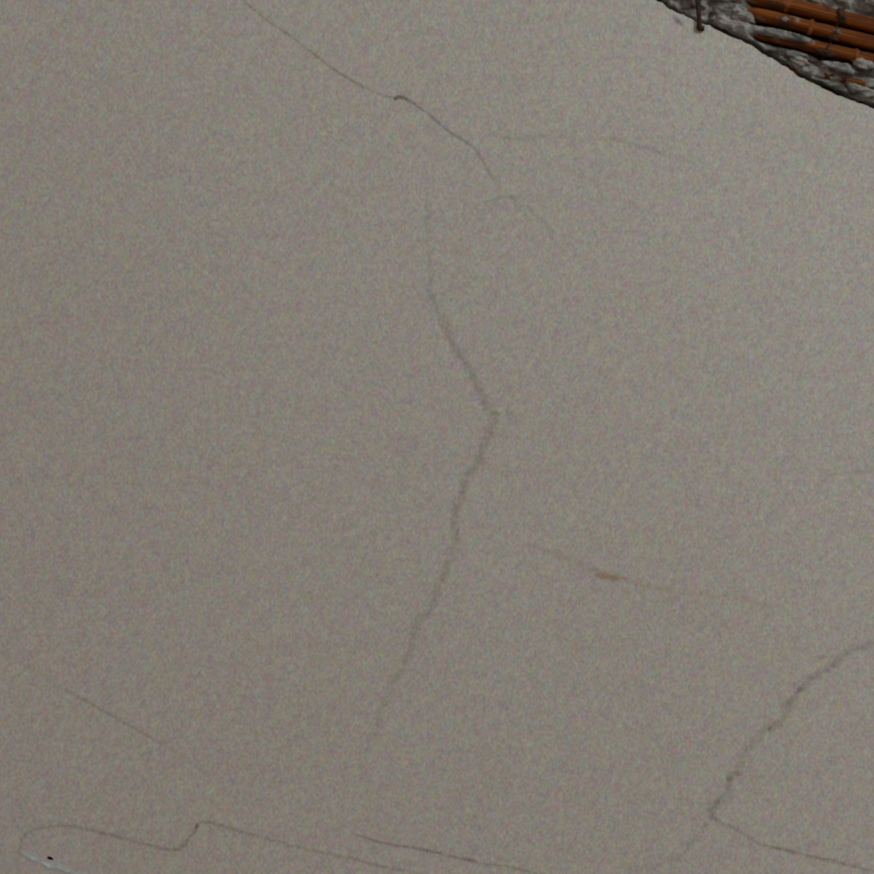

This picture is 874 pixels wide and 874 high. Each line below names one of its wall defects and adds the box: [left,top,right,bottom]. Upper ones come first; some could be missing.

spalling [656,0,874,109]